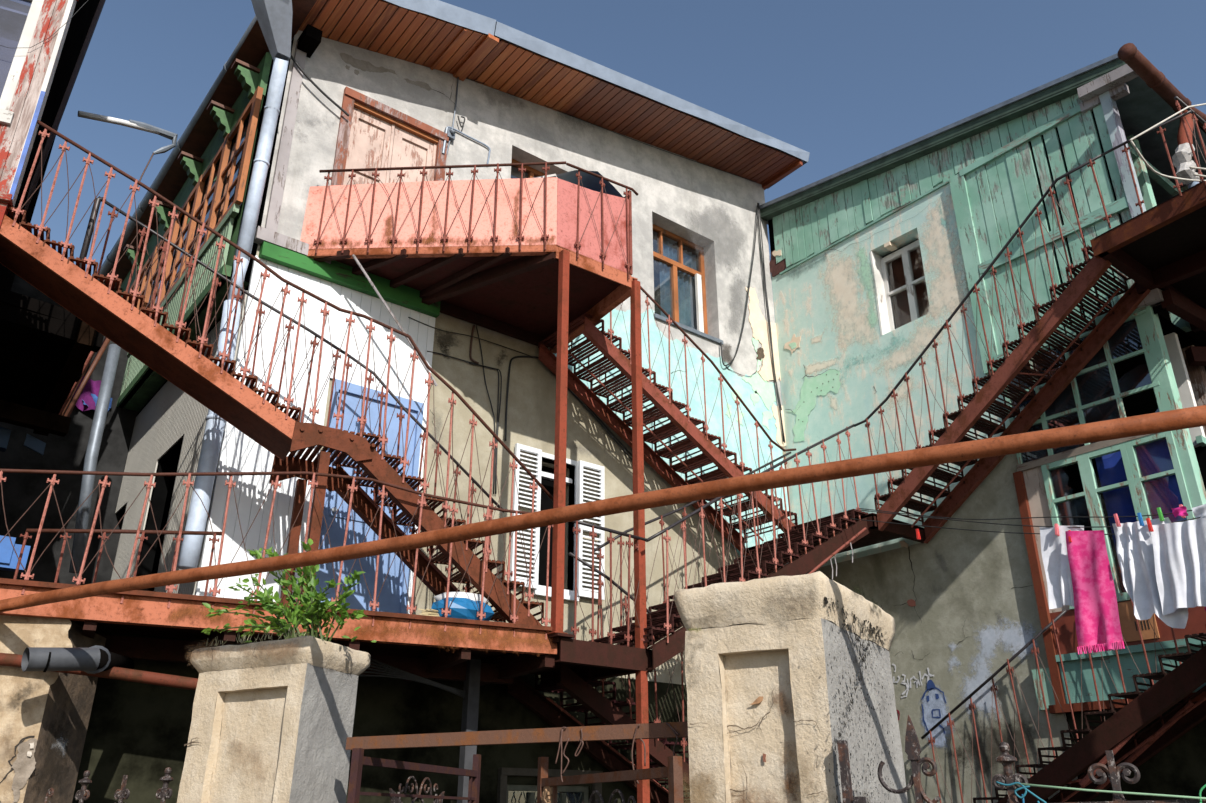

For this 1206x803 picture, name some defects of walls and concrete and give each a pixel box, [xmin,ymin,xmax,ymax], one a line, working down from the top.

corrosion [385,217,499,246]
peeling [878,201,967,369]
peeling [553,248,877,480]
peeling [889,379,912,407]
peeling [705,487,790,557]
peeling [11,738,37,803]
leakage [36,725,67,790]
crack [690,689,824,795]